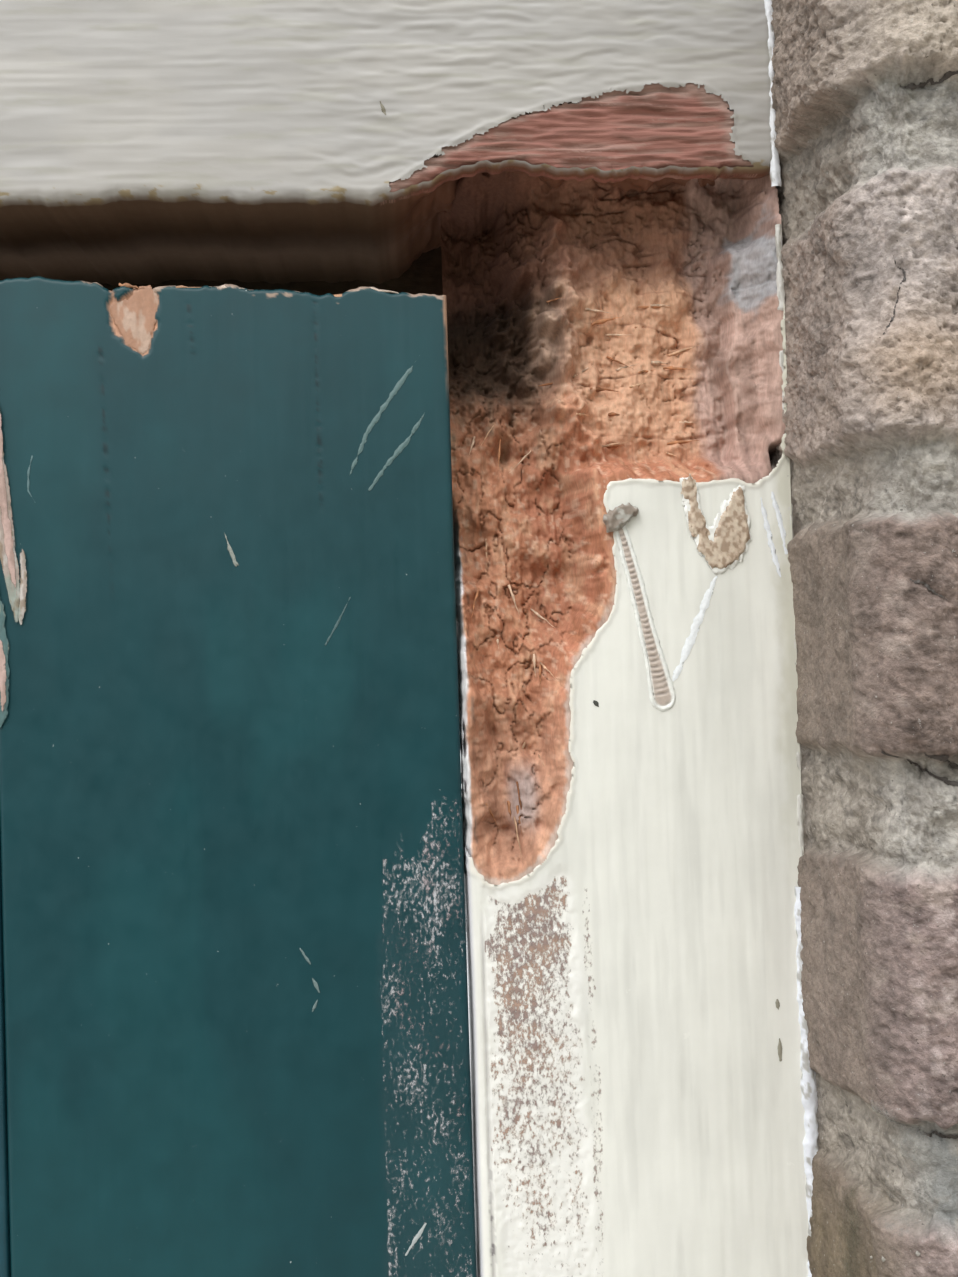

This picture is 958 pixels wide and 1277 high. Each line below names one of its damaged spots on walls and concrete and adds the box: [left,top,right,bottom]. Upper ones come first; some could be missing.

crack [900,71,958,90]
spalling [110,283,158,355]
peeling [0,414,27,727]
spalling [381,83,786,1044]
peeling [383,1045,472,1276]
peeling [485,877,603,1254]